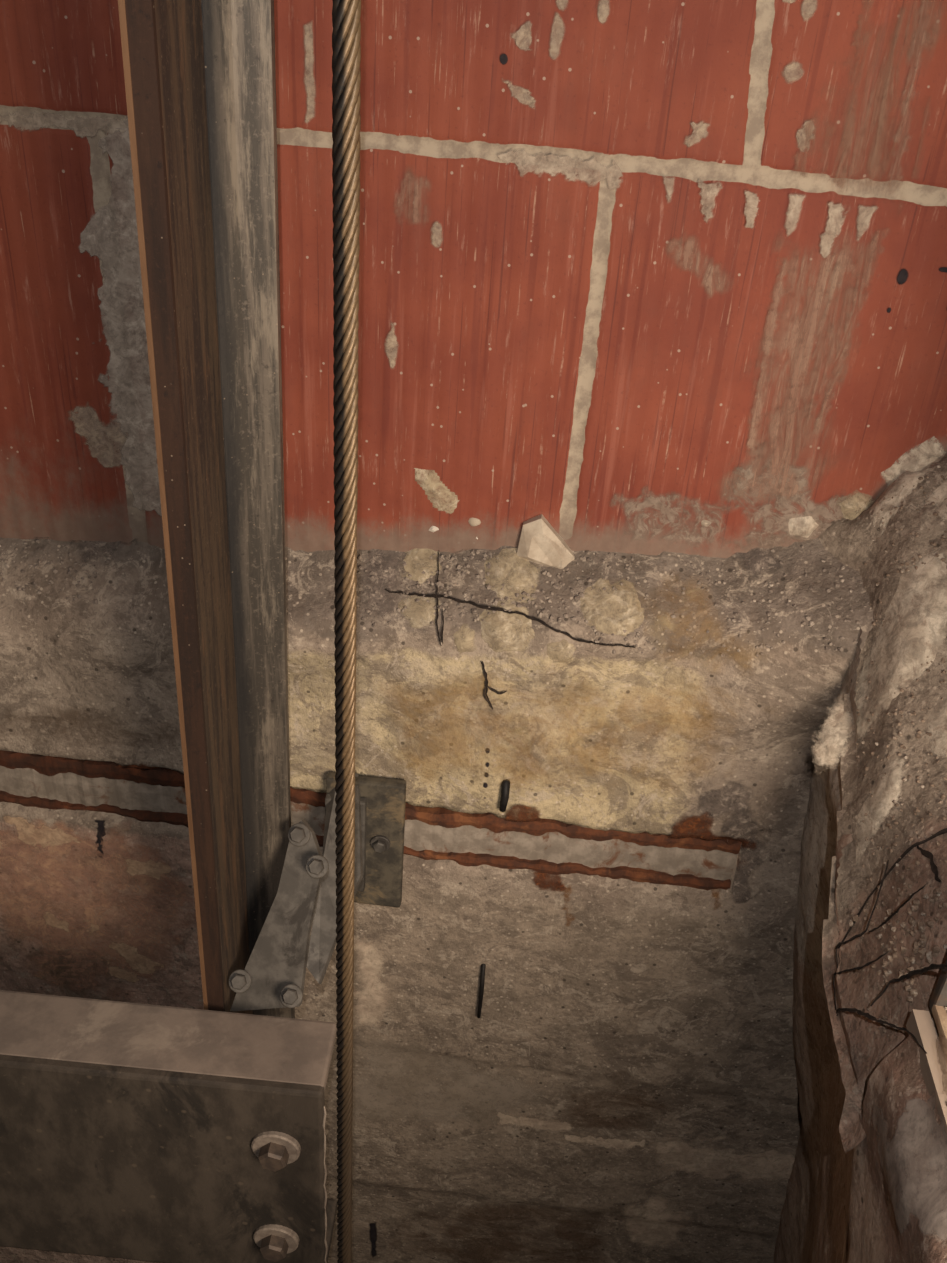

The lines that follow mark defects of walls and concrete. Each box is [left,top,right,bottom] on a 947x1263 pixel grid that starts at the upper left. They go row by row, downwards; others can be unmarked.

damp [744,191,759,228]
damp [786,194,805,235]
damp [724,202,879,501]
spalling [0,537,184,774]
spalling [285,547,336,793]
crack [385,552,635,648]
spalling [0,802,204,1010]
corrosion [506,805,540,822]
corrosion [534,871,574,926]
spalling [295,538,874,1263]
corrosion [669,813,756,863]
crack [833,828,947,1054]